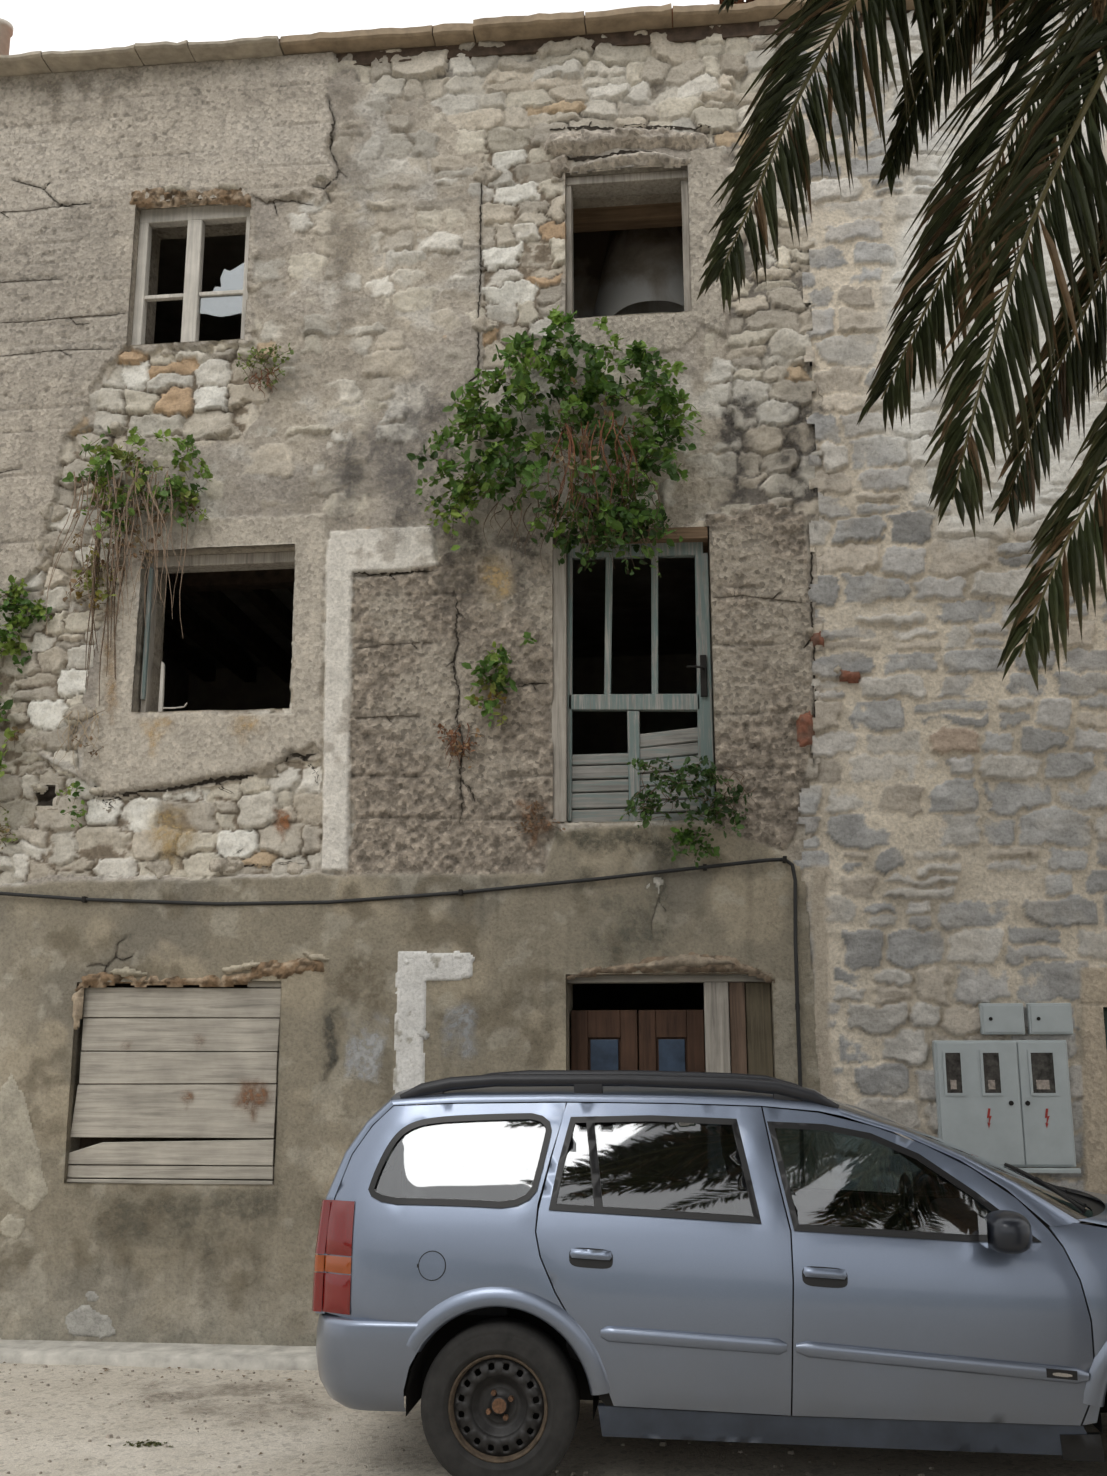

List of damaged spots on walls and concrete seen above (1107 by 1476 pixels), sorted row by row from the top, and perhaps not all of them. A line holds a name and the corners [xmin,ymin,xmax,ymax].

crack [0,180,90,218]
crack [255,101,347,214]
spalling [0,342,323,885]
crack [354,570,475,823]
crack [715,552,816,718]
spalling [72,952,329,1029]